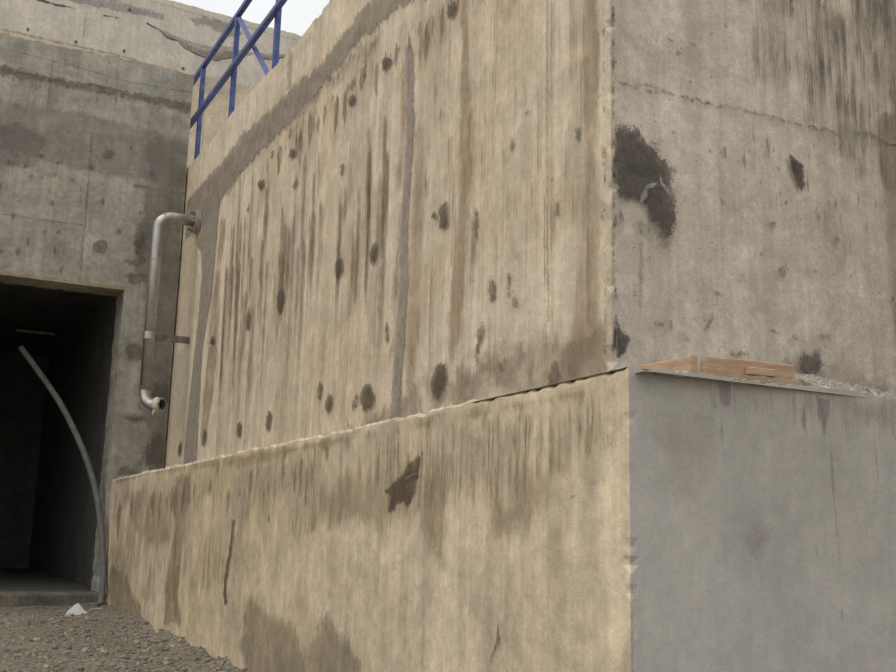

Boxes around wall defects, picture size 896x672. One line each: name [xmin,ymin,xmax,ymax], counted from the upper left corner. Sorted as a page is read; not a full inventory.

leakage [70,0,163,19]
leakage [110,0,409,623]
leakage [385,47,414,419]
crack [744,112,896,146]